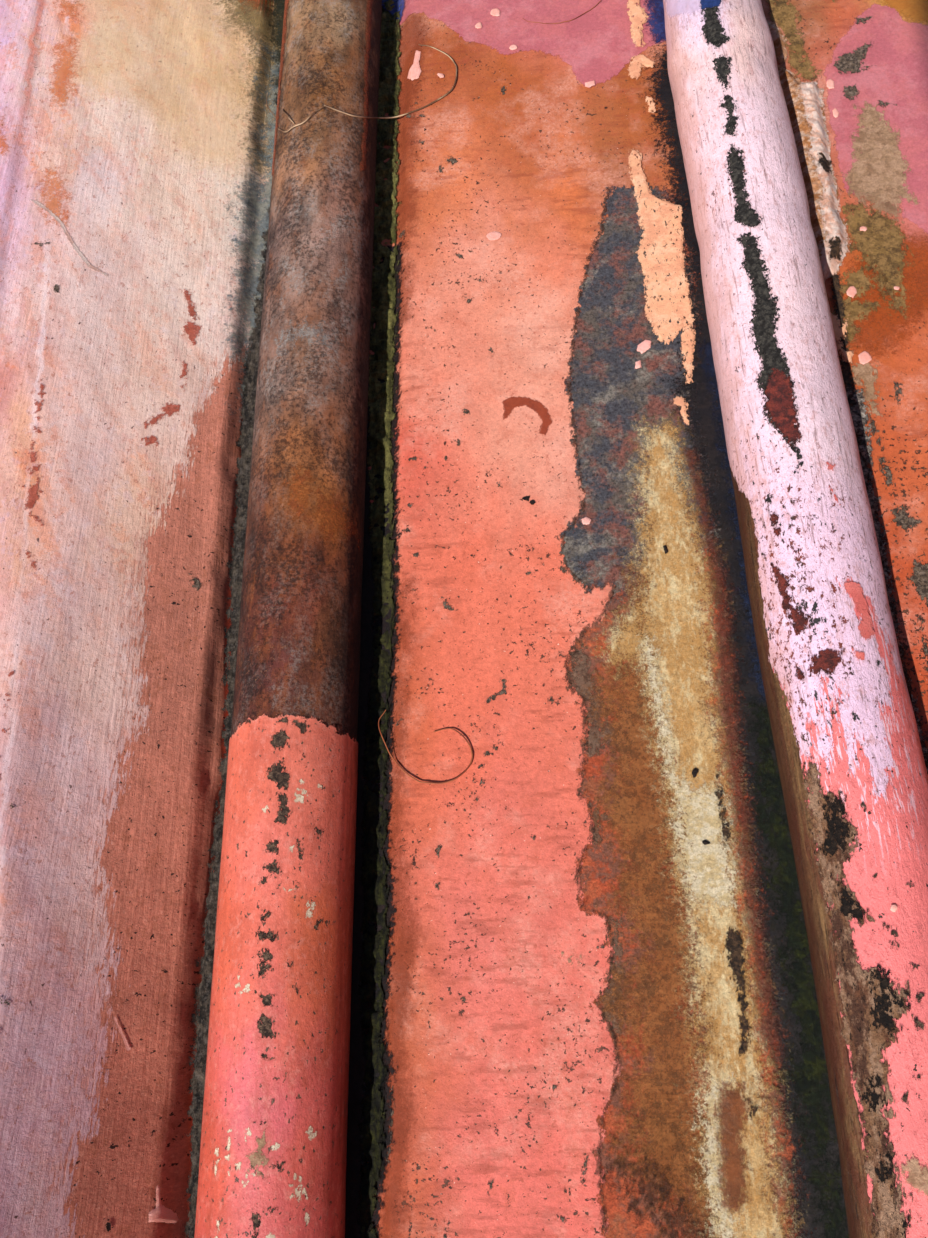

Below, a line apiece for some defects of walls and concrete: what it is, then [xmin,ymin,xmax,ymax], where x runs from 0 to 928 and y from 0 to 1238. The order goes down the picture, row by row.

peeling [627,0,655,79]
peeling [699,0,805,475]
peeling [766,0,919,487]
peeling [254,908,293,1038]
peeling [258,839,298,885]
peeling [266,717,311,825]
damp [360,0,849,1238]
peeling [559,149,731,1238]
corrosion [595,414,796,1238]
peeling [681,490,812,1238]